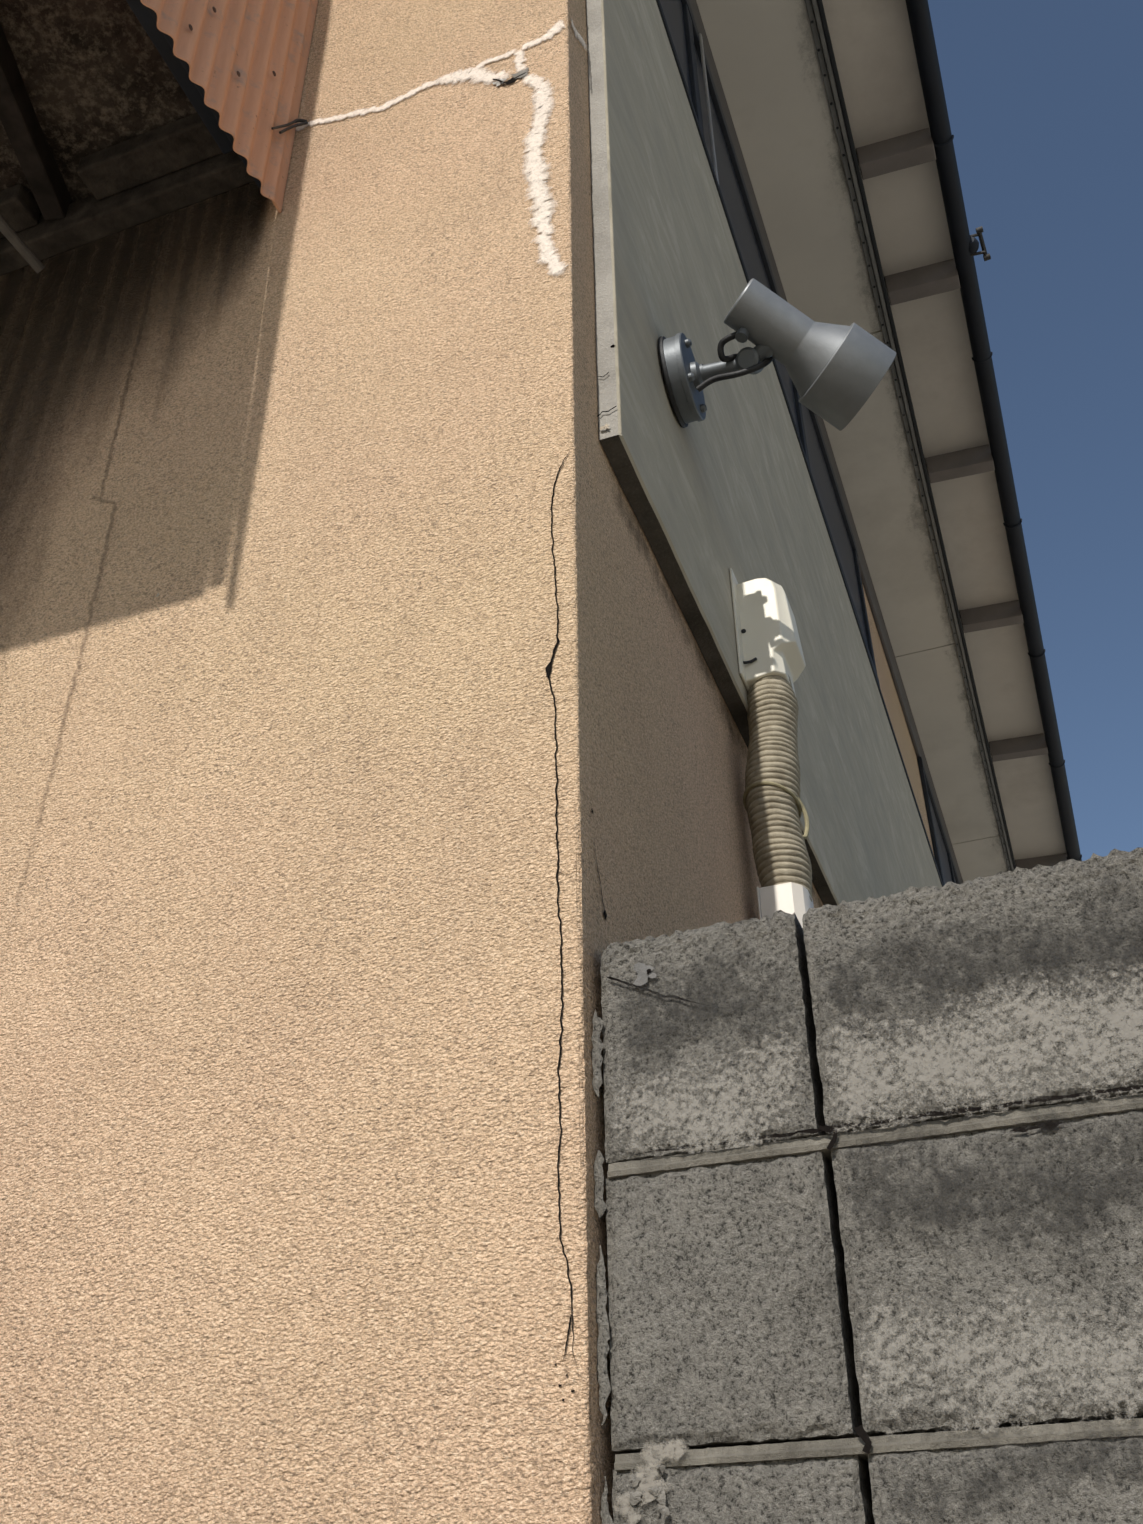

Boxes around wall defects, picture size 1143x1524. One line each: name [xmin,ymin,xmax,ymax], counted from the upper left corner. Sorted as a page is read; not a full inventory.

crack [295,19,587,274]
damp [0,181,267,476]
crack [545,450,607,1401]
crack [606,976,696,1003]